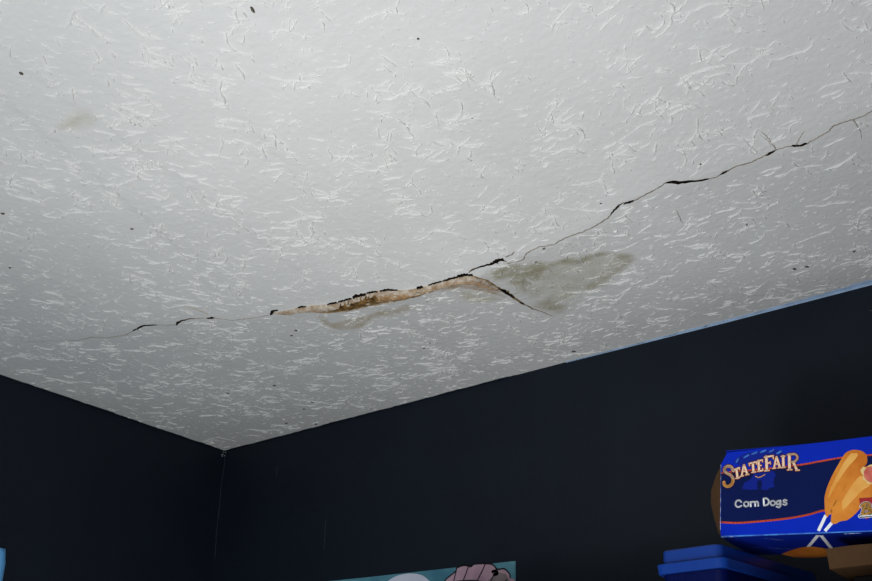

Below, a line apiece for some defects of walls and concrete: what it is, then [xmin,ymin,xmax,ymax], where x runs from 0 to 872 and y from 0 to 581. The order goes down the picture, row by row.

flaking render [268,273,503,315]
crack [468,111,872,316]